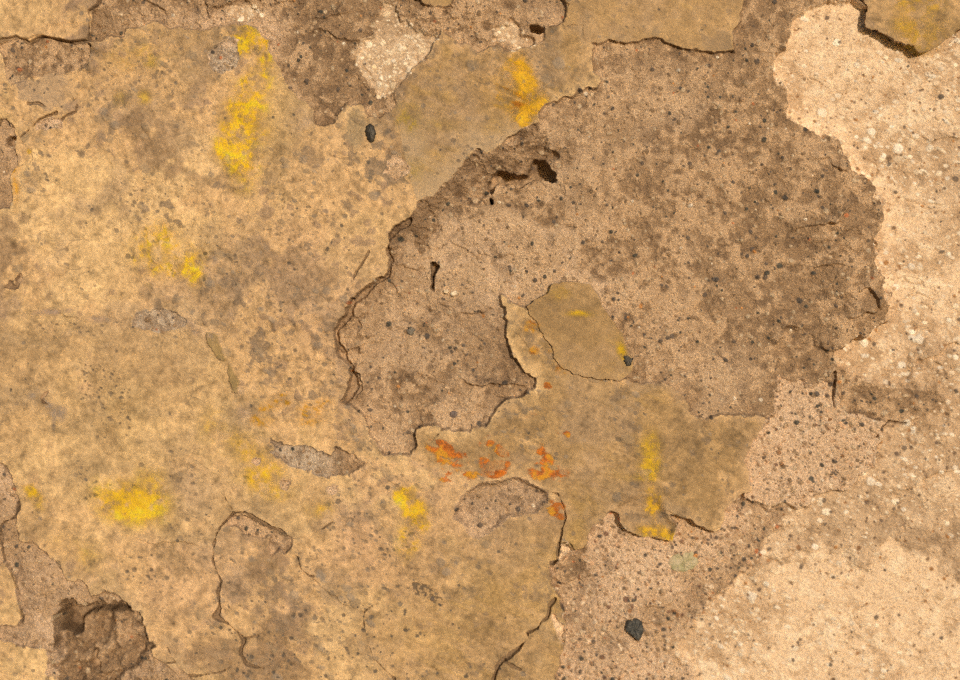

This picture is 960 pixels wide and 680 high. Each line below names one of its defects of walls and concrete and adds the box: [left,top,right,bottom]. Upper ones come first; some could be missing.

spalling [0,0,744,458]
spalling [0,463,194,680]
crack [164,488,286,678]
spalling [252,439,368,496]
crack [492,597,557,680]
flaking render [412,281,946,680]